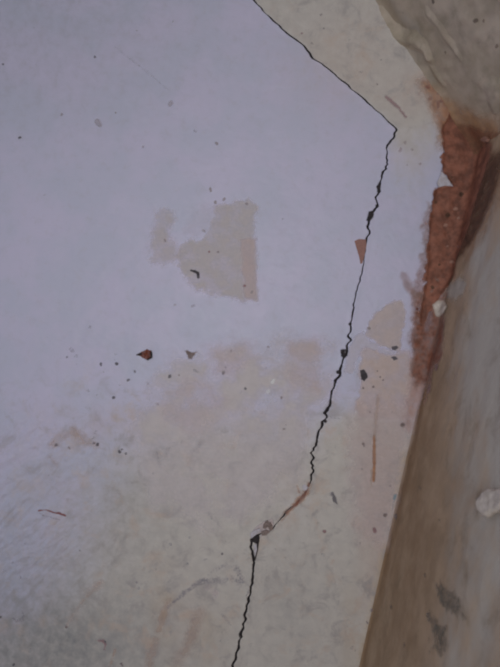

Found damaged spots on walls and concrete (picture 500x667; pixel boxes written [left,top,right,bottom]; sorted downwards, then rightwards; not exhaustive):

peeling [151,199,258,301]
crack [231,0,397,667]
spalling [419,115,500,325]